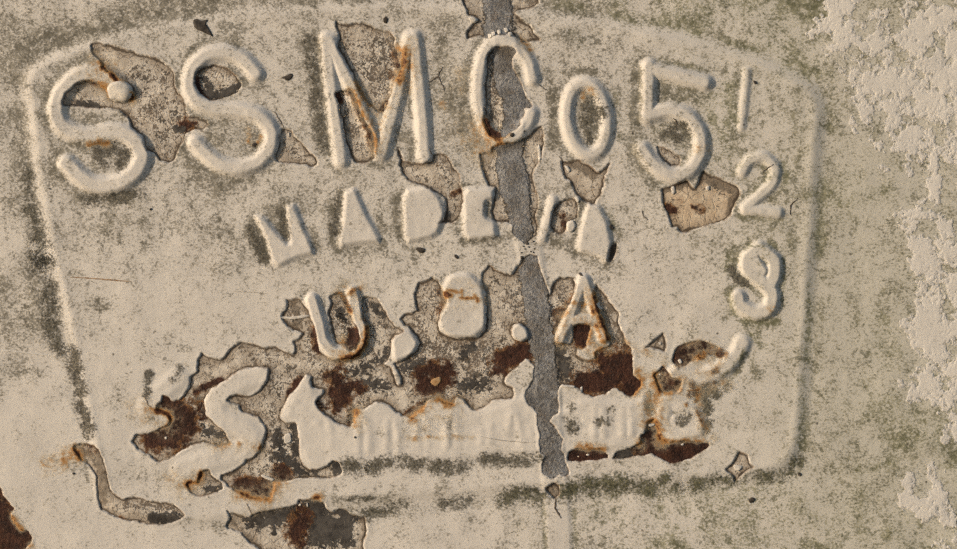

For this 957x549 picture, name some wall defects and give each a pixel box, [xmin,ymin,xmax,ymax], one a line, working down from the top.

peeling [63,43,207,163]
peeling [335,17,402,163]
peeling [662,172,740,232]
peeling [133,52,544,498]
corrosion [141,403,174,429]
corrosion [406,394,457,424]
peeling [542,272,641,397]
peeling [568,424,709,463]
corrosion [633,339,728,448]
peeling [648,334,719,392]
peeling [75,444,184,524]
peeling [227,499,367,549]